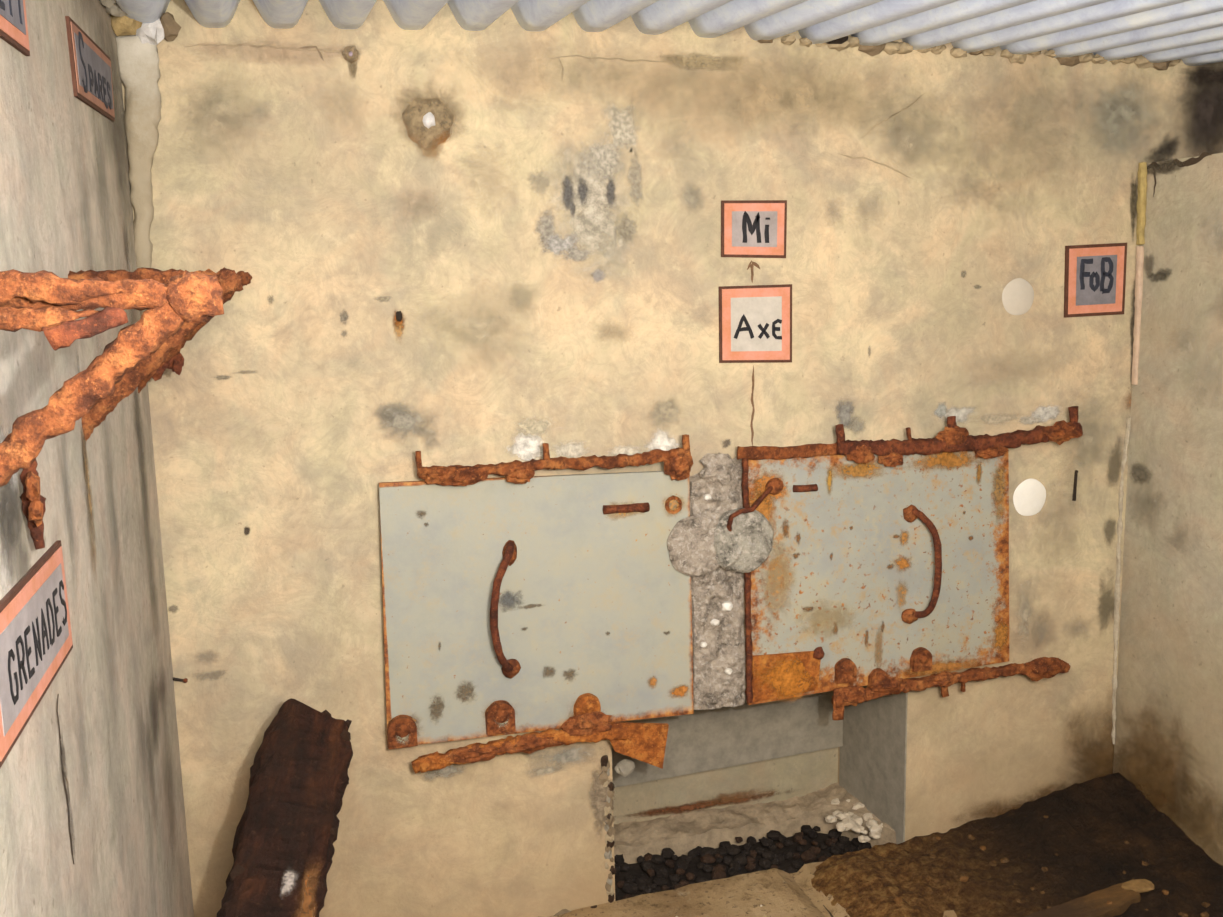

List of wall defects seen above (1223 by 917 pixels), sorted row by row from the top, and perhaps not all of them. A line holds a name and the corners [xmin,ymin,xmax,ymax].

spalling [400,95,459,154]
leakage [1190,67,1223,149]
leakage [1150,140,1177,162]
peeling [538,107,641,261]
corrosion [152,353,184,381]
corrosion [25,471,43,527]
corrosion [749,473,786,522]
corrosion [827,463,880,493]
corrosion [917,452,1005,517]
peeling [710,601,733,626]
corrosion [670,685,688,697]
corrosion [757,658,821,698]